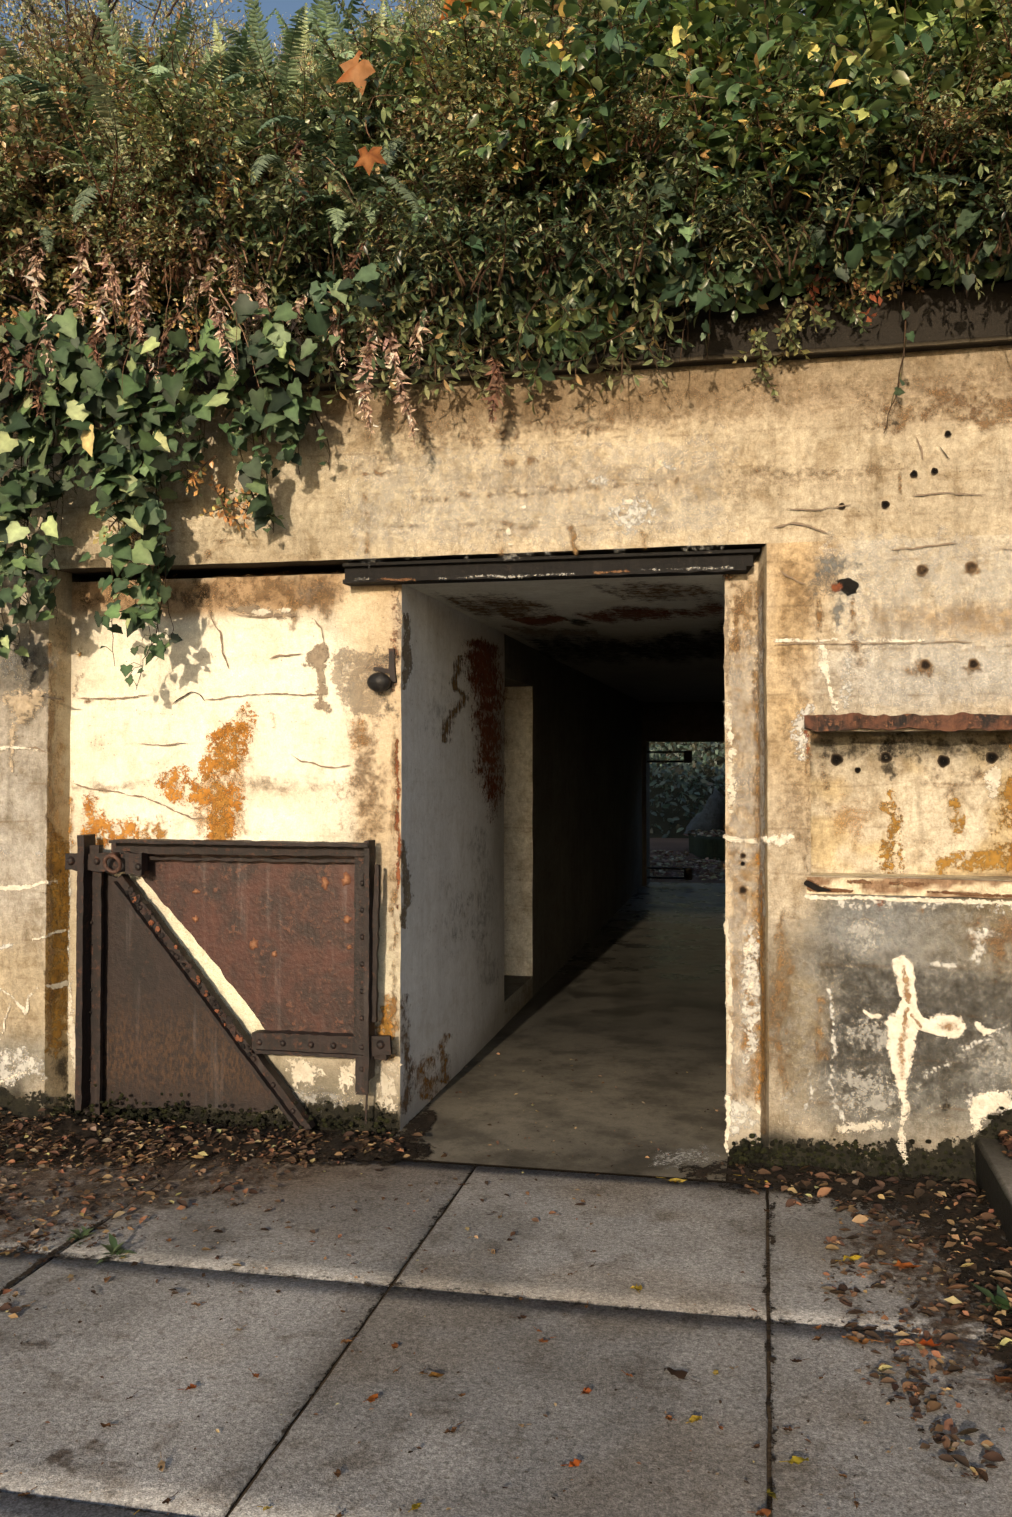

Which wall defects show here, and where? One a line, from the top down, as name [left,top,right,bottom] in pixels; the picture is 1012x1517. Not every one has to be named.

crack [77,609,324,703]
crack [73,783,204,819]
corrosion [44,642,257,1059]
crack [292,755,349,768]
corrosion [321,871,351,890]
water stain [446,570,1012,1183]
corrosion [876,789,905,874]
corrosion [936,744,1012,875]